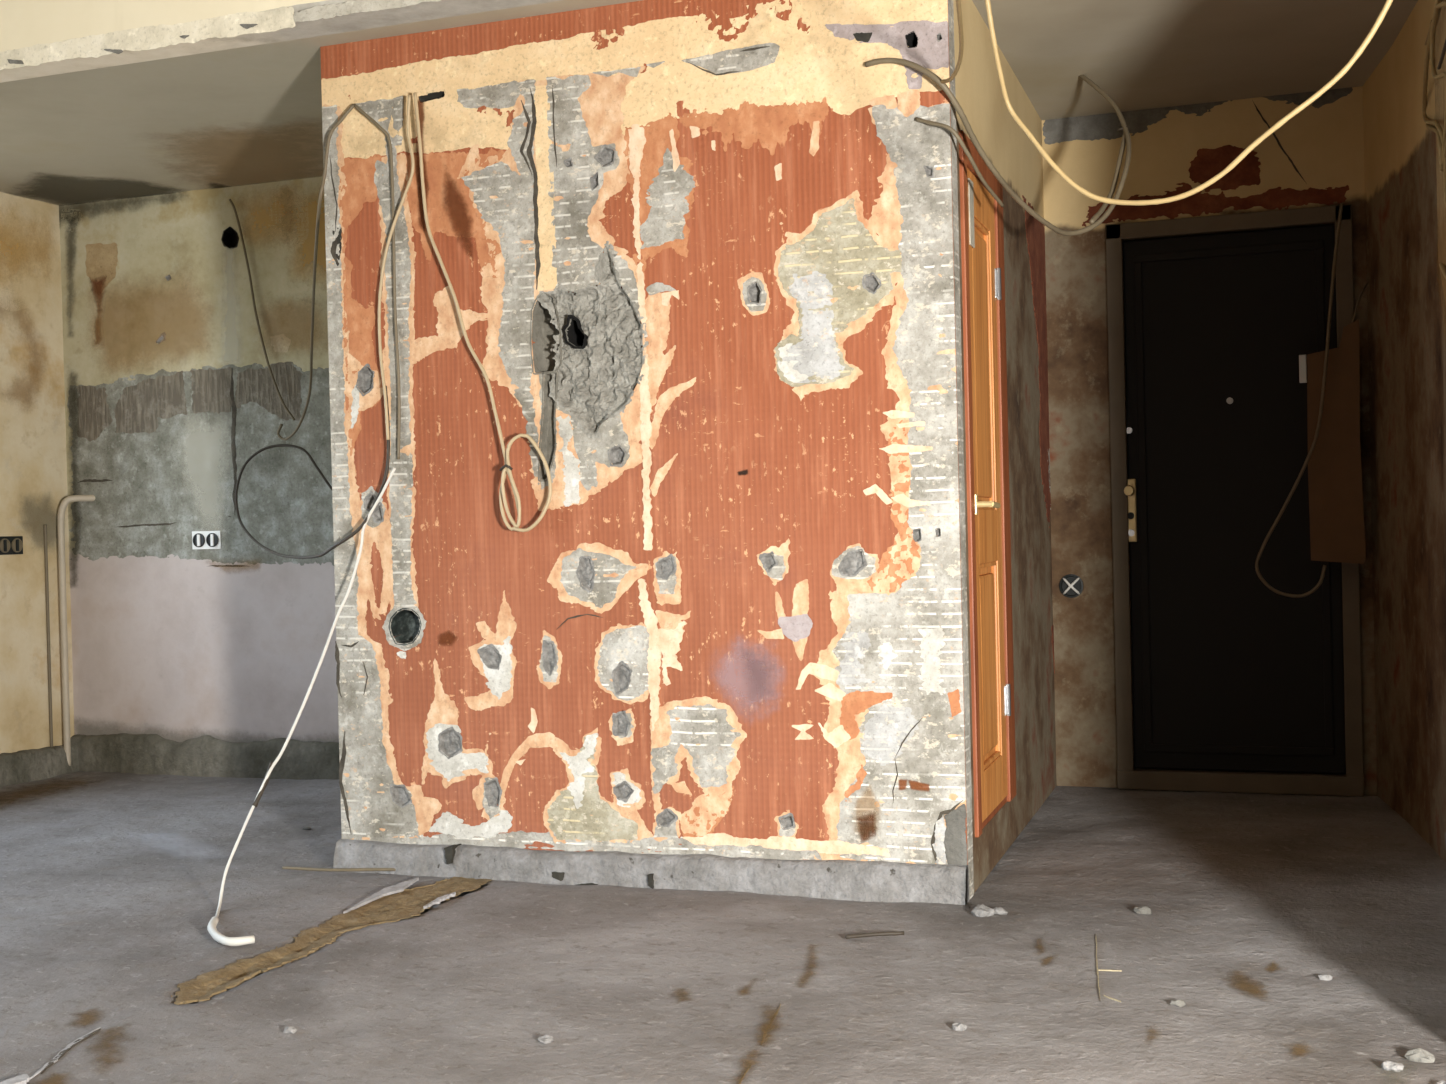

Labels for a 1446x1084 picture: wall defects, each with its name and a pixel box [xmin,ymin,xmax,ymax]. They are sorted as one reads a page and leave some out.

leakage [23,176,174,313]
leakage [251,200,326,271]
peeling [1082,145,1349,227]
peeling [1435,0,1446,302]
flaking render [67,43,780,864]
flaking render [742,20,967,865]
crack [171,877,492,1005]
flaking render [552,872,598,885]
crack [0,1010,120,1084]